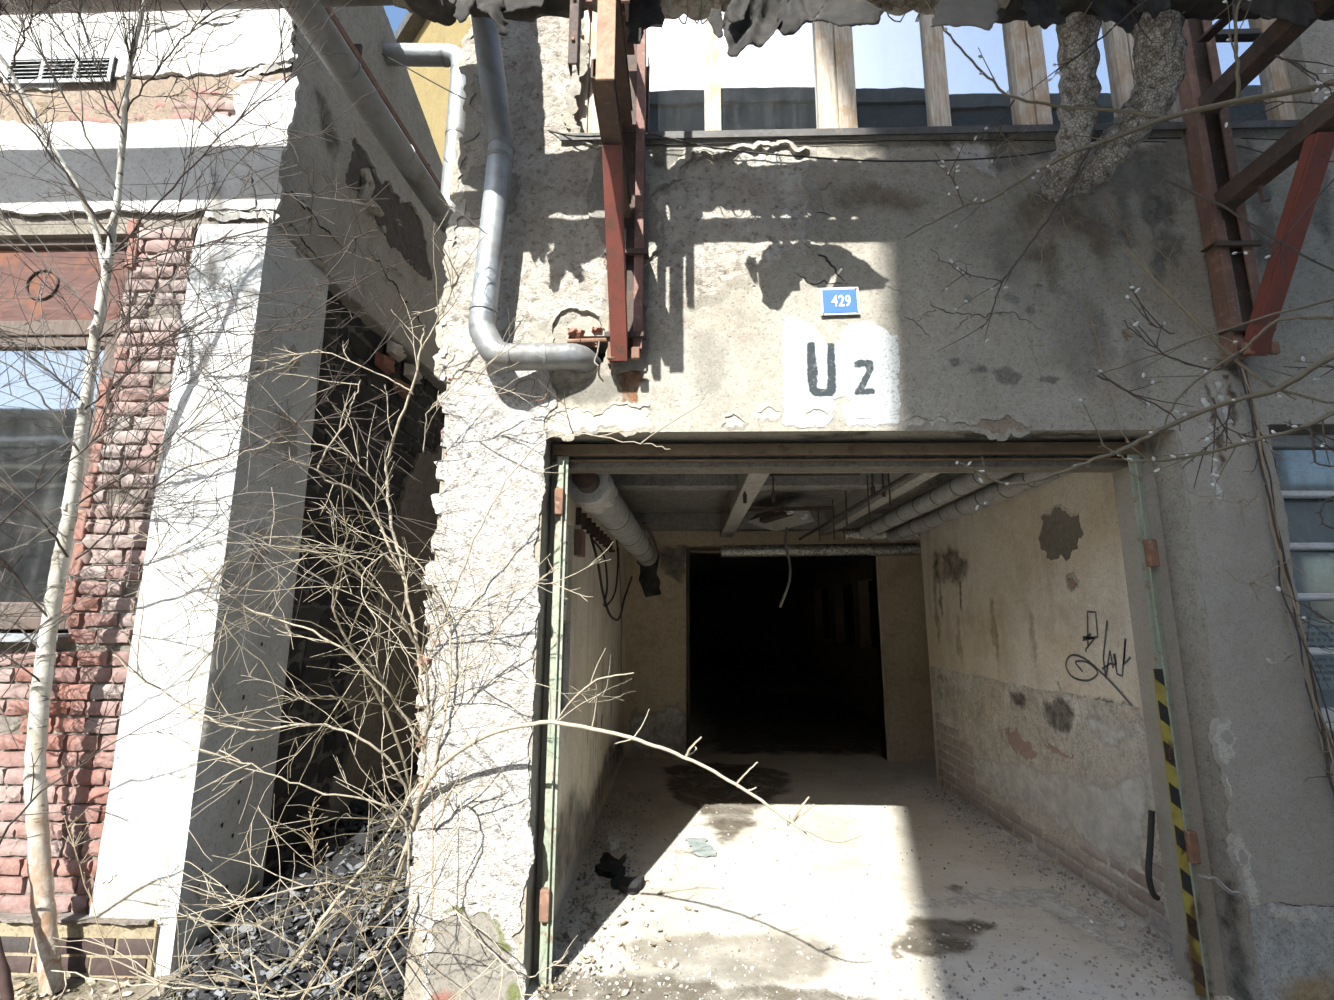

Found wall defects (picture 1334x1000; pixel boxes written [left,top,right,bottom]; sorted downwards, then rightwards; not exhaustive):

flaking render [69,88,244,123]
flaking render [334,15,501,399]
flaking render [496,16,612,384]
damp [1017,146,1186,282]
spalling [421,540,446,601]
flaking render [1038,504,1085,592]
spalling [415,615,442,683]
spalling [415,694,432,748]
damp [555,691,881,883]
damp [893,917,994,957]